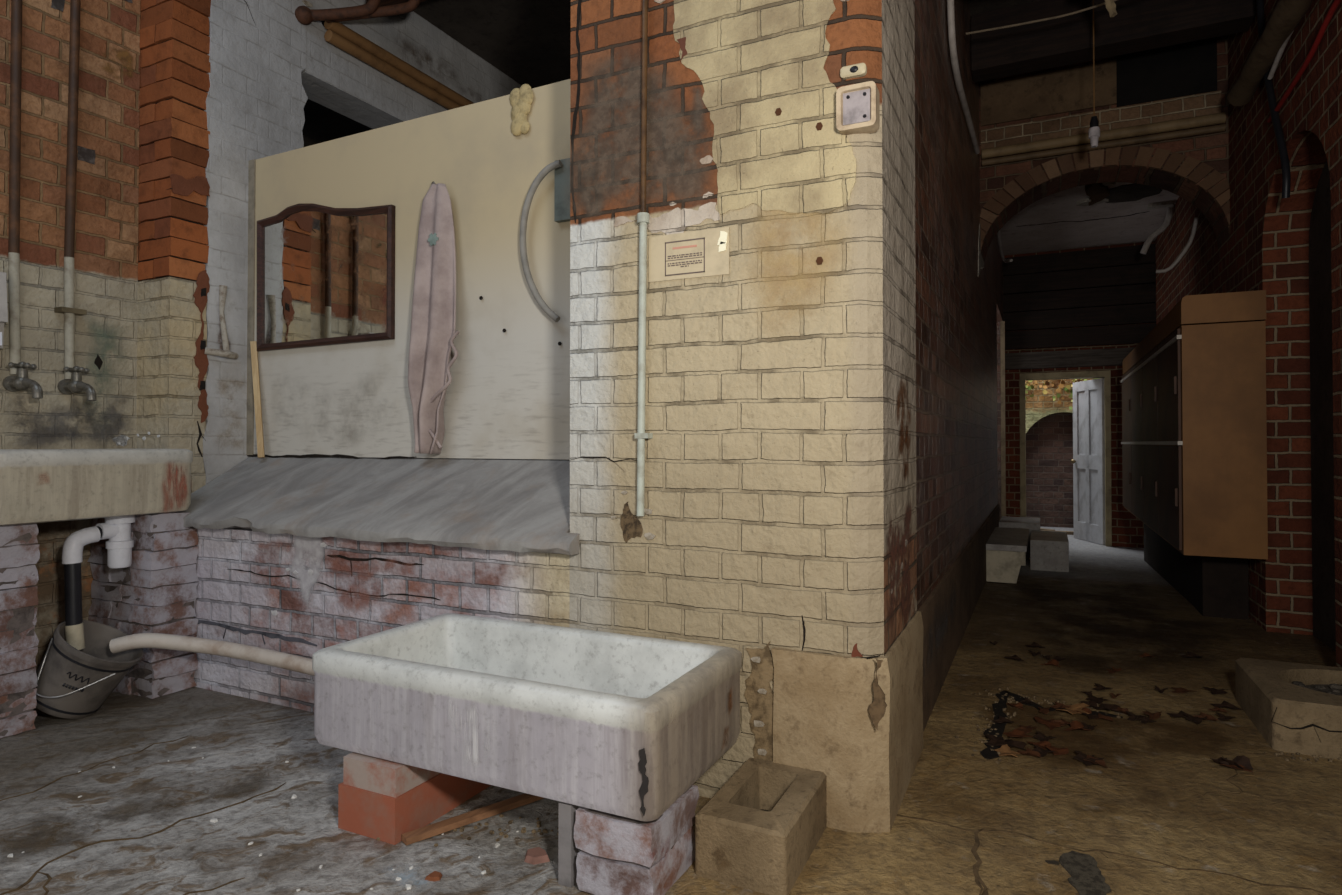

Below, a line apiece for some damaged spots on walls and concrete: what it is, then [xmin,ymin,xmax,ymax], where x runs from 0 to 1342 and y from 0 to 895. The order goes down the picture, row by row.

peeling [614,0,857,235]
spalling [193,270,210,423]
crack [0,736,188,801]
spalling [744,642,774,761]
peeling [851,643,887,729]
crack [1271,707,1342,742]
crack [0,783,285,895]
crack [897,815,1330,895]